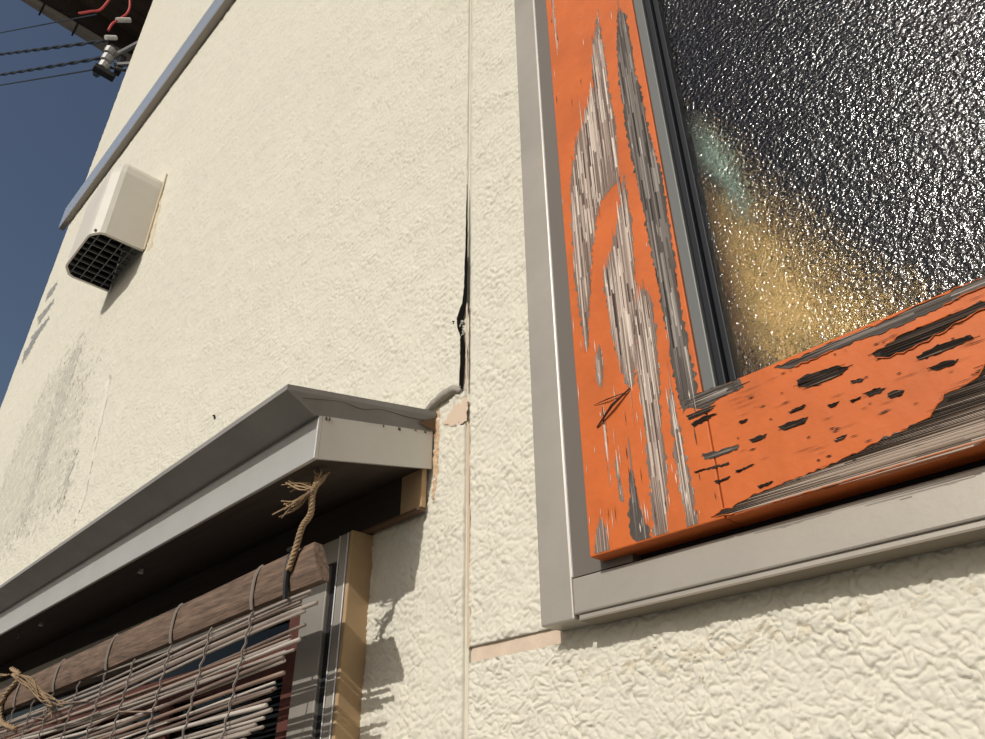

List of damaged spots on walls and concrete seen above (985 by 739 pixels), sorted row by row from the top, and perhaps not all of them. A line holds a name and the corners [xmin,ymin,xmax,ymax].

crack [457,184,468,389]
peeling [570,0,985,554]